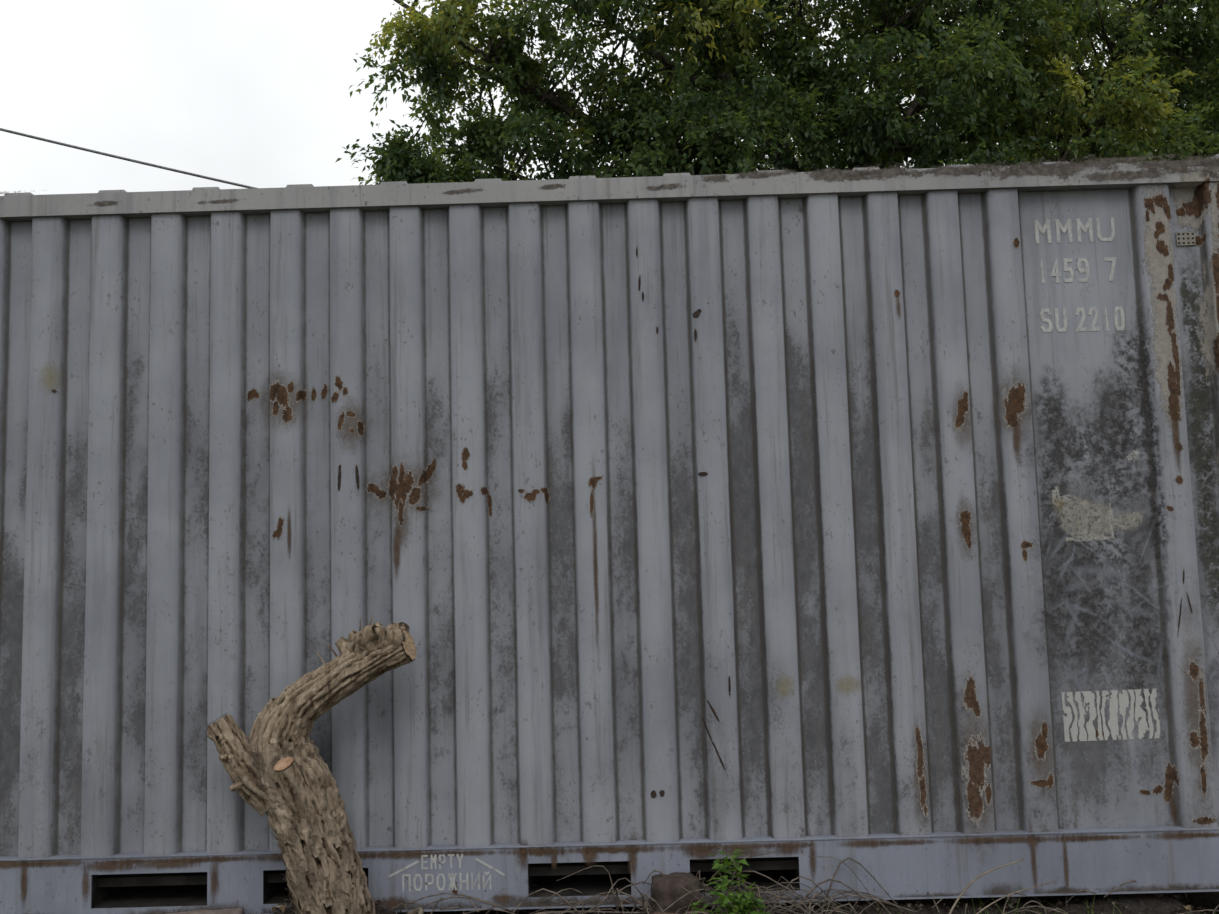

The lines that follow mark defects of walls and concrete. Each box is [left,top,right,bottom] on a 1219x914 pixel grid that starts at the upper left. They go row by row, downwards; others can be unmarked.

corrosion [1143,167,1219,485]
corrosion [246,374,365,438]
corrosion [954,391,970,433]
corrosion [1001,380,1029,452]
corrosion [338,458,437,572]
corrosion [1021,540,1034,562]
corrosion [952,671,1128,888]
corrosion [1139,759,1218,839]
corrosion [0,854,283,899]
corrosion [358,851,493,859]
corrosion [513,839,662,874]